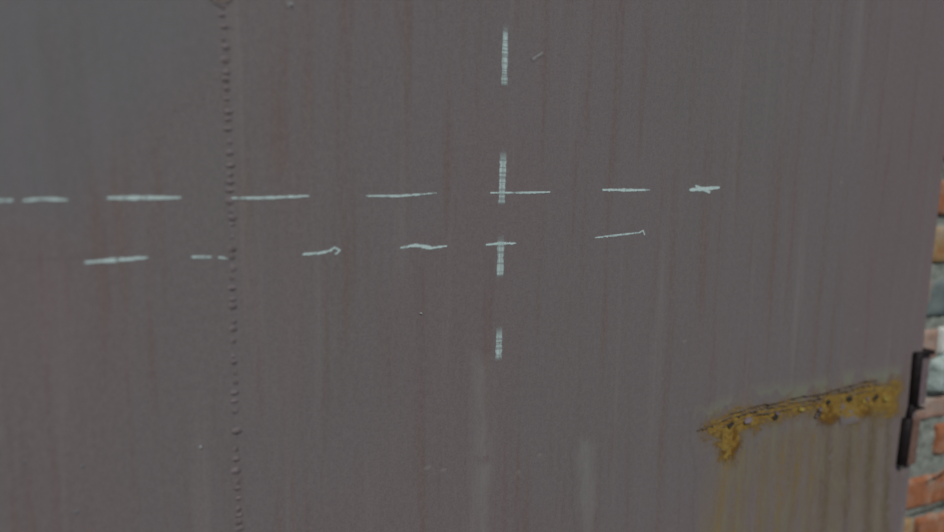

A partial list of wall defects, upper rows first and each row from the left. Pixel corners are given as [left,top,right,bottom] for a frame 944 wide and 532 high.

rust [690,359,911,532]